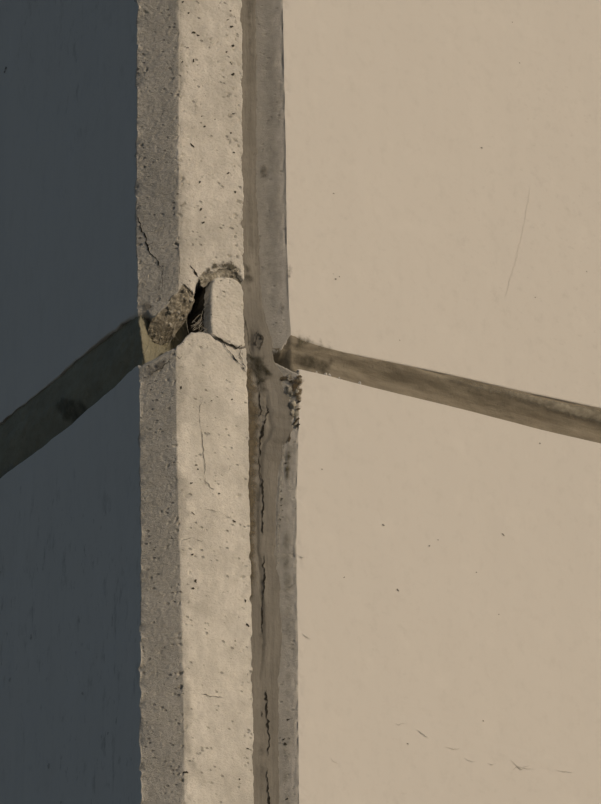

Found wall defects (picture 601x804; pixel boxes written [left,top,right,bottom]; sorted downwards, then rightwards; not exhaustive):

crack [138,218,198,294]
spalling [199,265,242,287]
spalling [148,285,195,345]
crack [208,332,245,371]